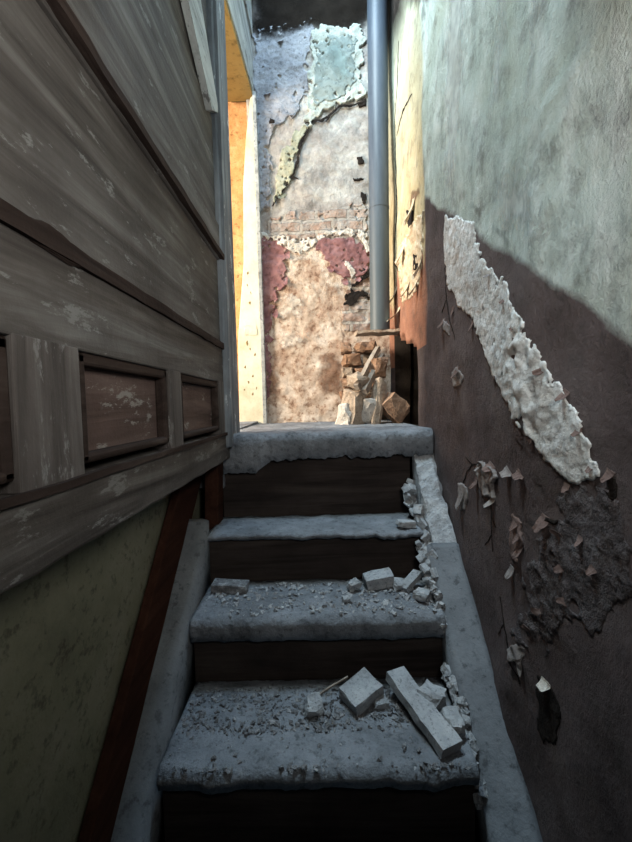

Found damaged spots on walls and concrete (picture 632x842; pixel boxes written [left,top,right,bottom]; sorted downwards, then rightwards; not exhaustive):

peeling [244,21,370,398]
peeling [437,215,617,501]
peeling [455,483,468,510]
peeling [504,514,524,579]
spalling [532,513,558,533]
peeling [507,644,525,677]
spalling [535,675,561,745]